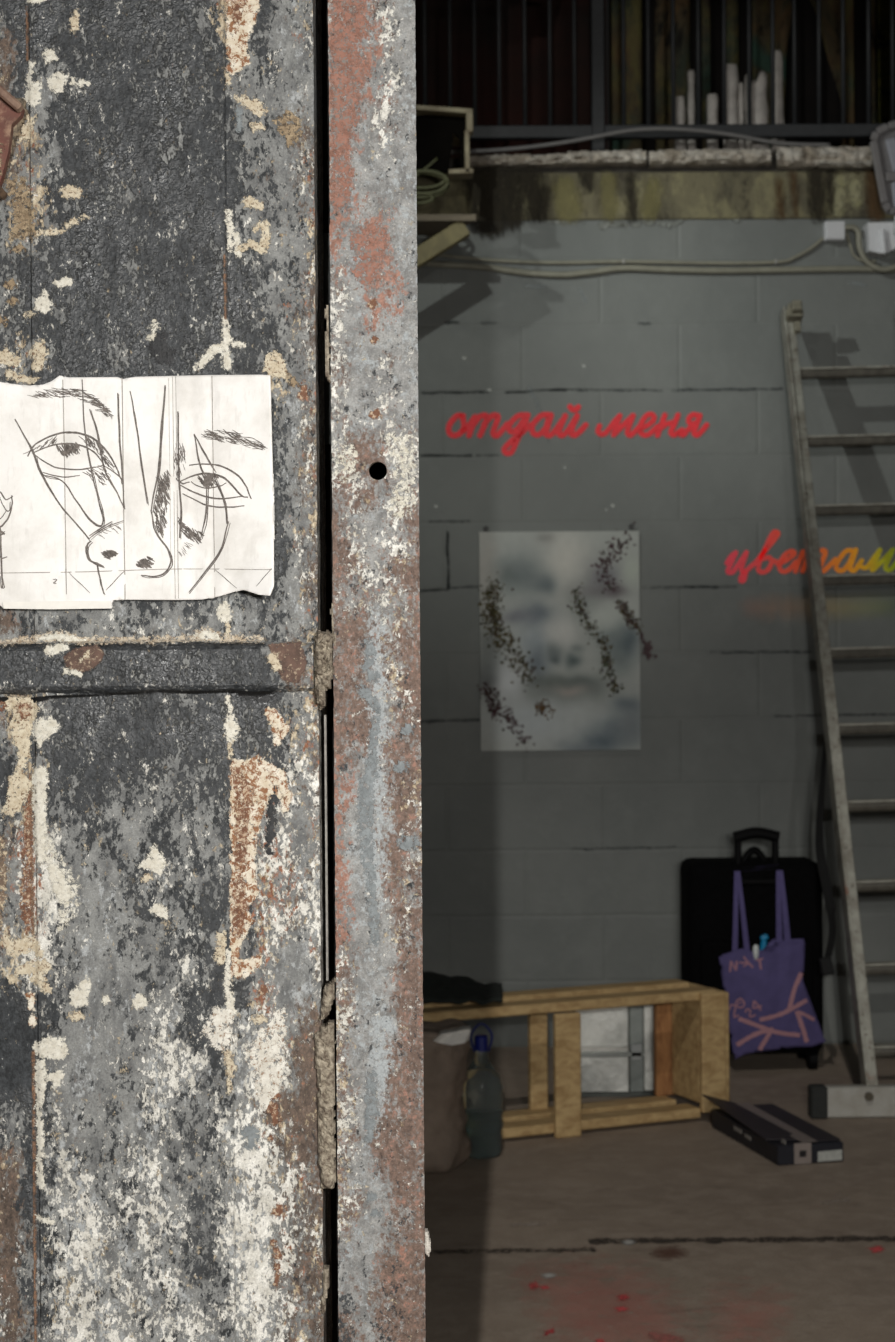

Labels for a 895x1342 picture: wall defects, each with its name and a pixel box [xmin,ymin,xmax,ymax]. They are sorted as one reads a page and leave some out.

peeling [0,0,94,254]
peeling [193,195,271,371]
rust [329,0,376,214]
rust [348,220,389,309]
damp [463,165,550,239]
damp [626,172,638,222]
damp [807,167,861,221]
rust [0,773,36,935]
peeling [0,694,81,933]
peeling [198,694,293,1110]
peeling [1,934,69,1189]
crack [431,1235,895,1254]